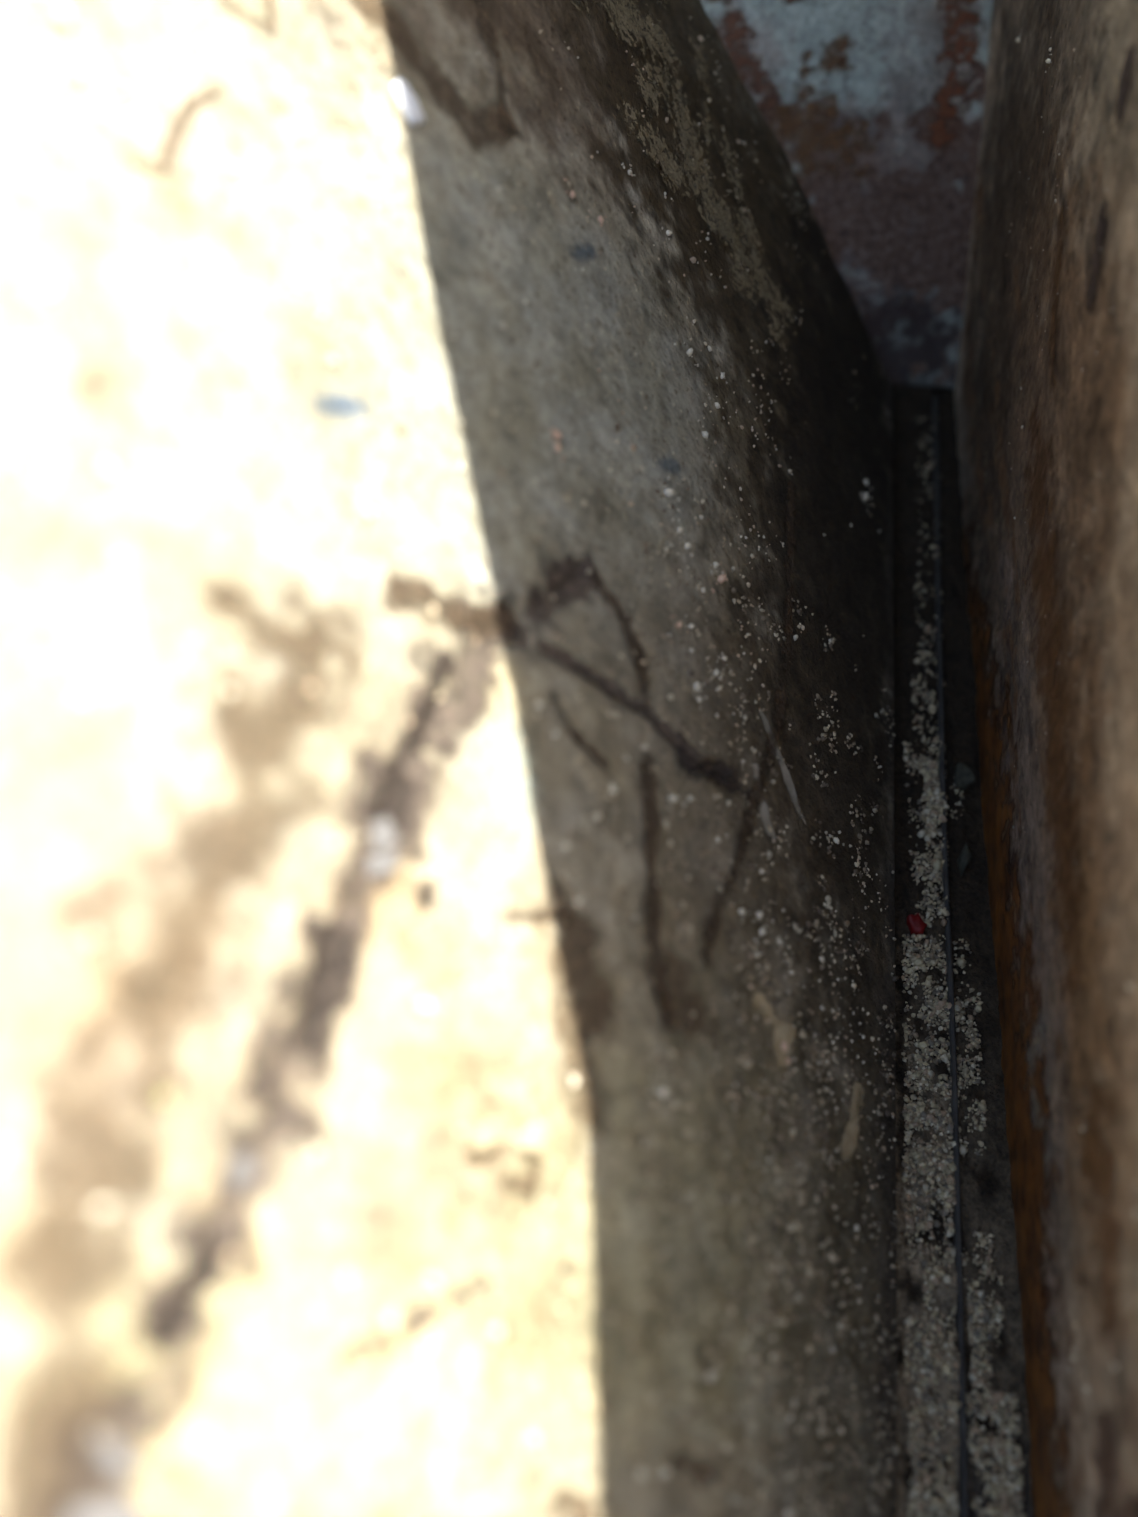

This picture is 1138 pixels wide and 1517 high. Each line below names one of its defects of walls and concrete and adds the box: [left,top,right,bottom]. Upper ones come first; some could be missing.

corrosion [709,0,778,111]
corrosion [799,34,854,80]
corrosion [928,0,983,153]
crack [36,480,797,1517]
corrosion [963,522,1081,1517]